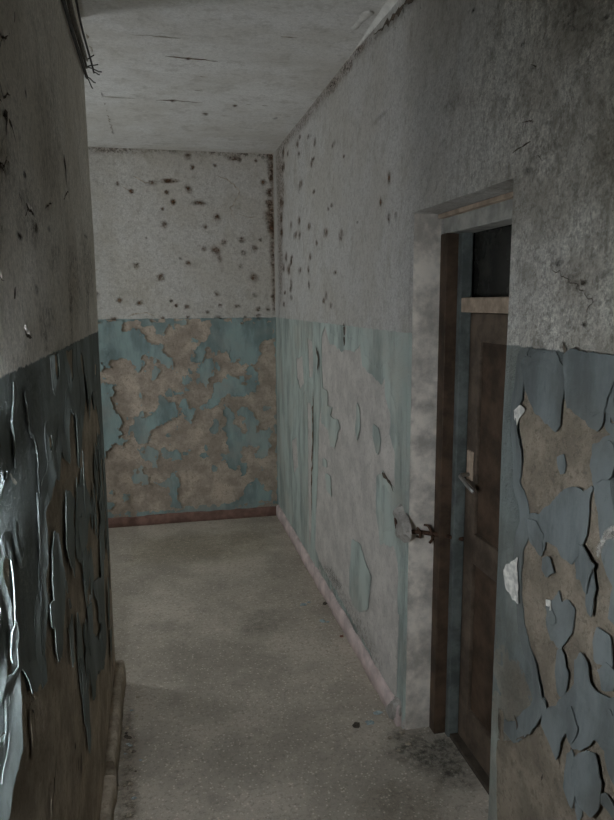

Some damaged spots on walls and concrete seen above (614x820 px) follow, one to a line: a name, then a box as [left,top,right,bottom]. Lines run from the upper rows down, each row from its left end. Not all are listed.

crack [0,85,53,221]
peeling [0,317,277,820]
peeling [307,323,412,720]
peeling [496,347,614,820]